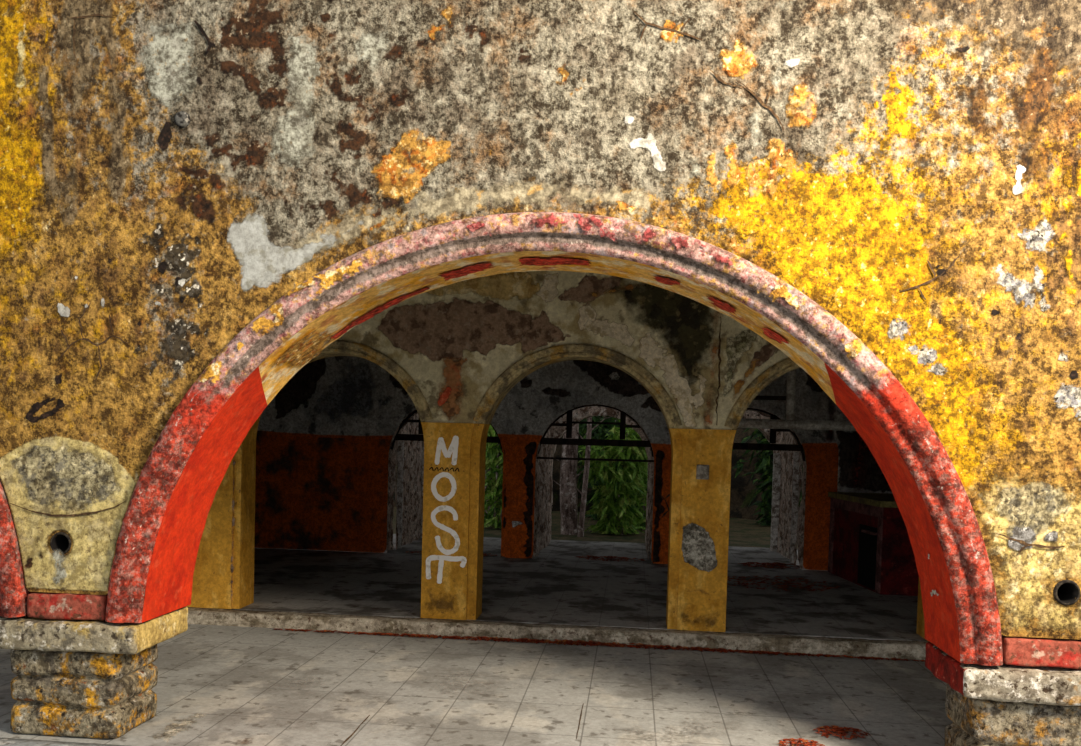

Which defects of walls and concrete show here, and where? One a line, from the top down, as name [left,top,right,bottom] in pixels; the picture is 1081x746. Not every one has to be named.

peeling [1063,133,1081,212]
peeling [137,0,982,493]
peeling [1018,213,1068,251]
peeling [995,264,1050,311]
peeling [1065,250,1077,307]
damp [519,310,571,353]
damp [558,275,714,386]
peeling [1054,353,1081,421]
peeling [682,523,717,572]